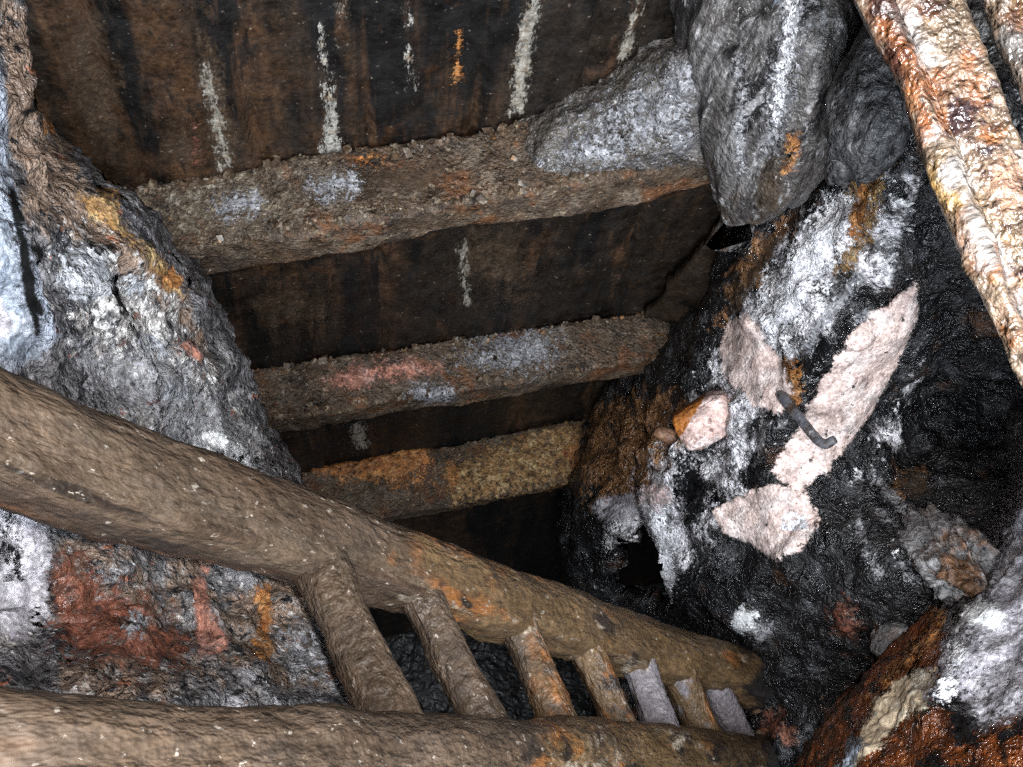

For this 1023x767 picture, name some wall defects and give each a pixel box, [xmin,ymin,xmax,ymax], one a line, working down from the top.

efflorescence [507,0,540,118]
efflorescence [537,1,701,175]
corrosion [780,130,803,176]
corrosion [833,176,886,276]
corrosion [730,239,779,305]
corrosion [780,356,806,405]
corrosion [825,591,865,641]
corrosion [759,705,799,747]